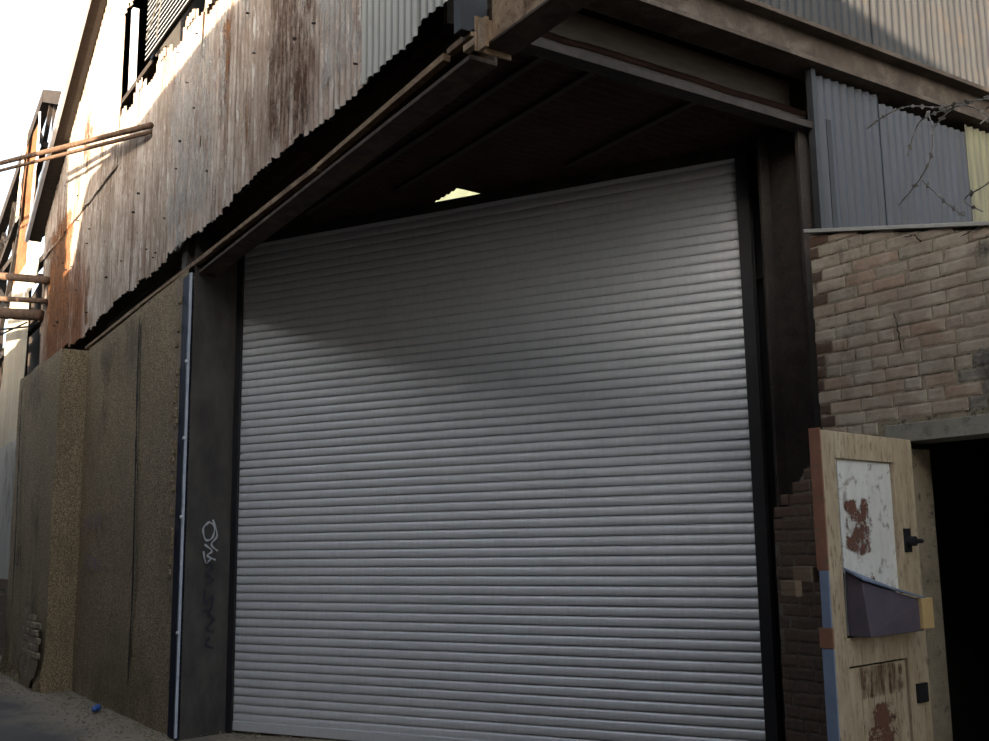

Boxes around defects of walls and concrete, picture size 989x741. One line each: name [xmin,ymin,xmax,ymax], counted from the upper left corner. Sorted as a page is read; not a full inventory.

corrosion [268,0,316,137]
corrosion [45,209,90,348]
spalling [12,602,42,688]